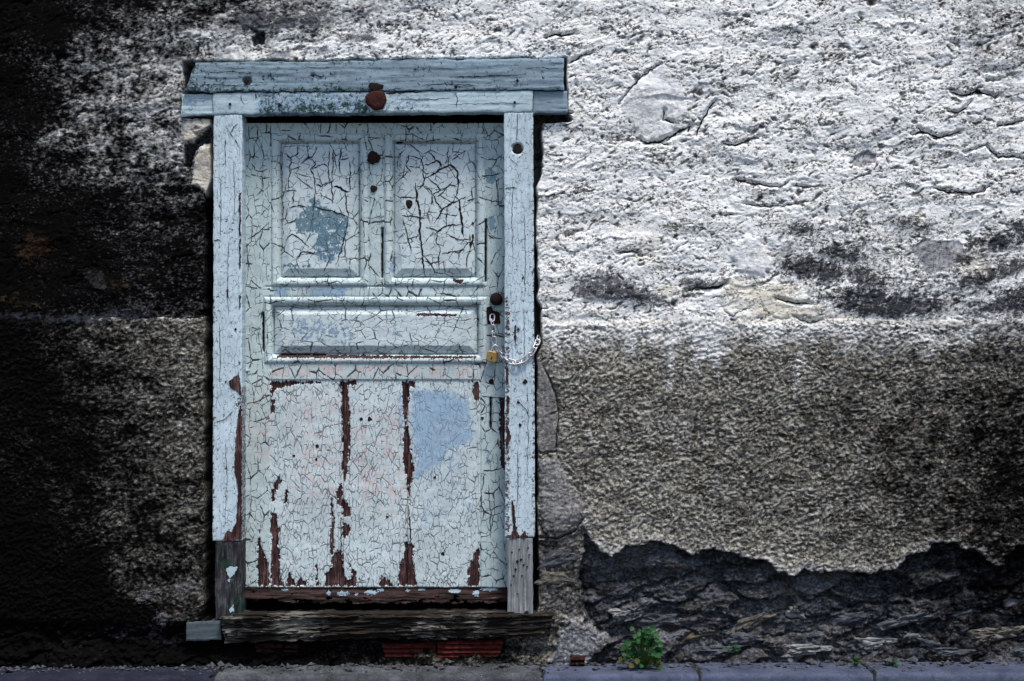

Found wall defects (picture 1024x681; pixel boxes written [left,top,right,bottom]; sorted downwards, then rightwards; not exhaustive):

crack [640,101,716,145]
crack [912,91,1024,159]
crack [735,179,808,207]
crack [935,185,990,194]
water stain [1,292,155,327]
crack [687,277,823,323]
flaking render [509,500,1024,670]
water stain [136,580,204,644]